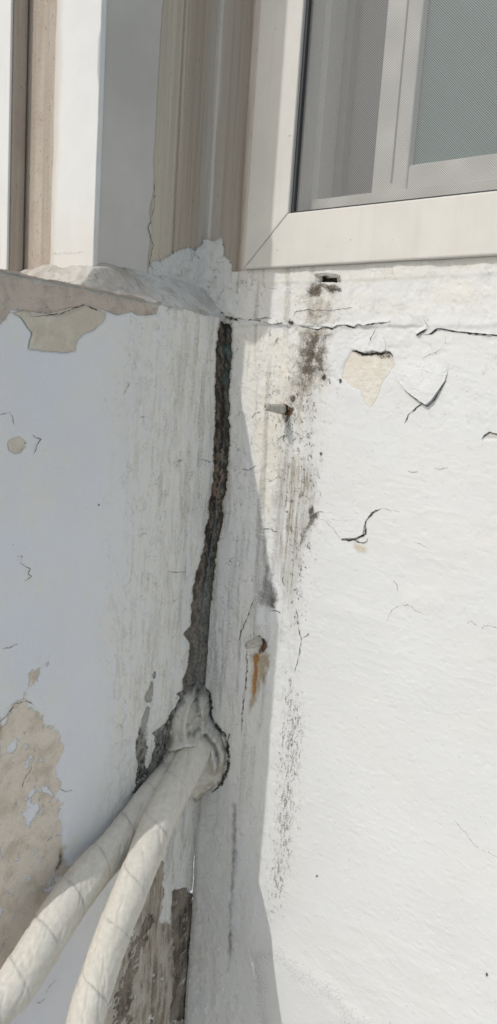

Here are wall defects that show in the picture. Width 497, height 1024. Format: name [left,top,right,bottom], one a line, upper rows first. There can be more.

spalling [0,269,162,353]
damp [298,332,342,390]
damp [307,283,340,297]
peeling [342,329,394,408]
crack [415,313,497,358]
crack [172,307,398,793]
rust [241,641,268,730]
spalling [0,661,72,969]
spalling [104,860,193,1024]